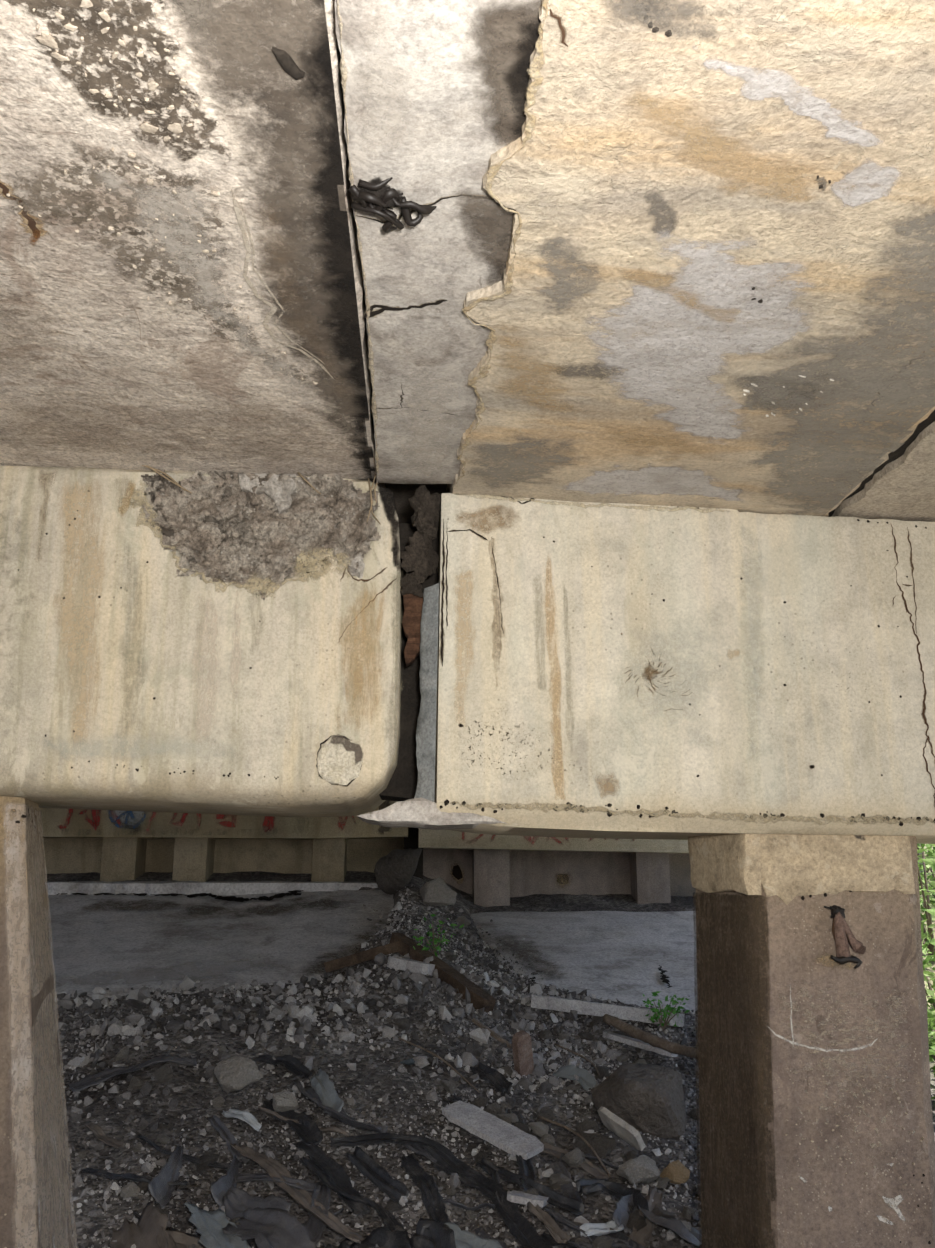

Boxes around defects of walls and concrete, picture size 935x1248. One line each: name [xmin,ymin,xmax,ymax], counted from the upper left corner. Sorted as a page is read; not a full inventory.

leakage [475,3,542,142]
peeling [6,0,318,401]
leakage [193,0,376,483]
spalling [337,0,379,474]
crack [364,299,447,318]
leakage [461,195,514,284]
crack [828,410,935,517]
spalling [128,469,381,600]
crack [891,525,935,807]
spalling [357,797,517,830]